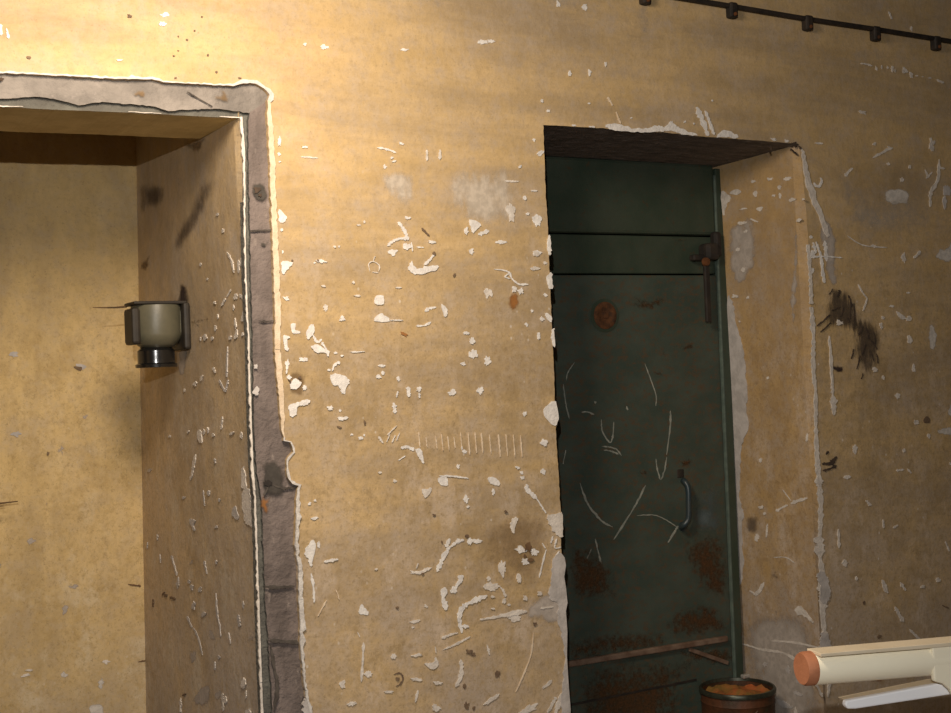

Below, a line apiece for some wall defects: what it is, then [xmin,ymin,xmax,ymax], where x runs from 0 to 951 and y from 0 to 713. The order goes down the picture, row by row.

peeling [589,100,738,139]
peeling [387,216,439,275]
peeling [721,177,805,282]
peeling [374,295,402,322]
peeling [416,304,448,327]
damp [820,289,879,379]
flaking render [0,71,350,713]
peeling [750,236,841,713]
peeling [436,538,482,572]
peeling [440,545,539,633]
flaking render [523,553,571,713]
peeling [547,512,563,537]